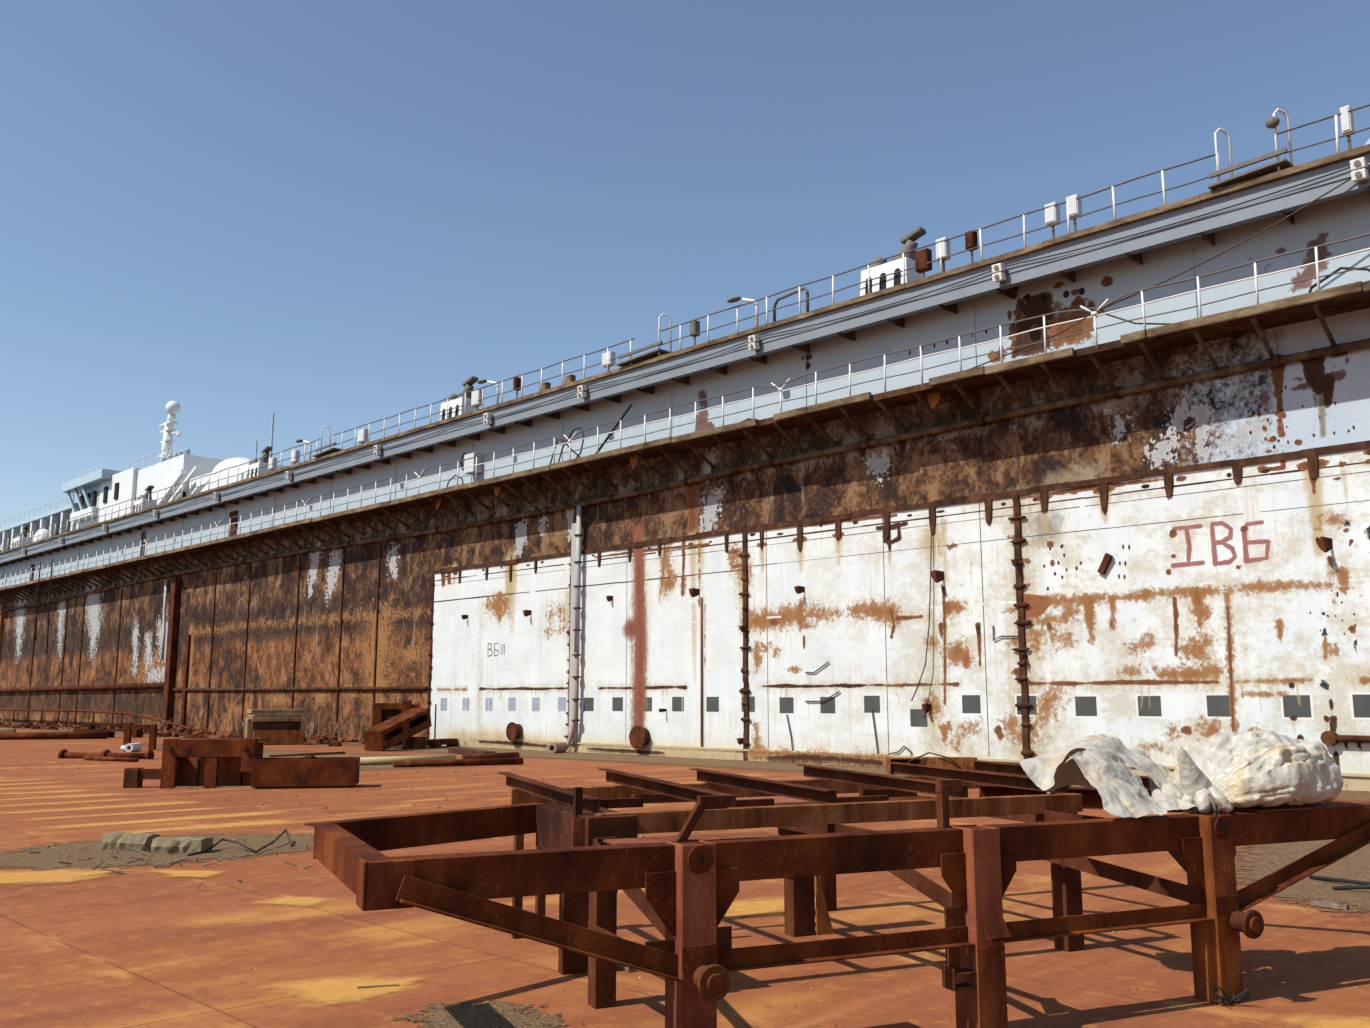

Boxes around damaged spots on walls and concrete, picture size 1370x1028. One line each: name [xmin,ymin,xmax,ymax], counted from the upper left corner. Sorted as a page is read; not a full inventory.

corrosion [693,390,715,432]
corrosion [727,348,1370,756]
corrosion [485,555,515,622]
corrosion [544,592,570,640]
corrosion [594,471,710,728]
corrosion [186,593,431,718]
corrosion [451,729,557,751]
corrosion [585,719,889,767]
corrosion [1323,699,1363,772]